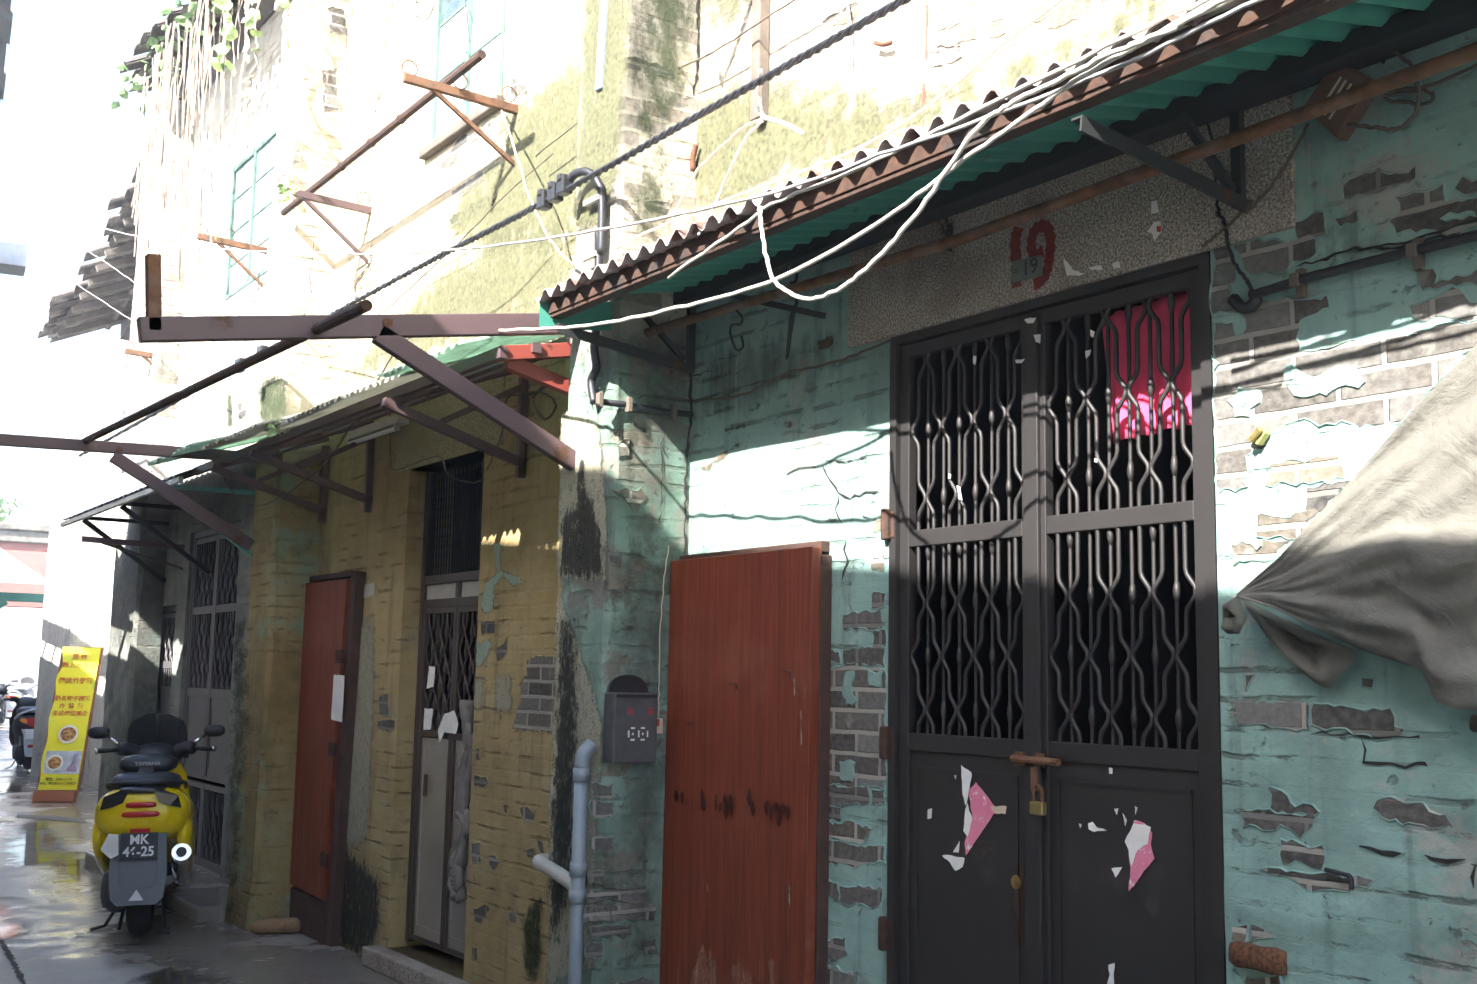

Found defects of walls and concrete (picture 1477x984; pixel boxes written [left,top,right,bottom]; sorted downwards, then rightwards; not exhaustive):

peeling [1233,165,1477,276]
peeling [1209,267,1477,567]
water stain [558,457,604,580]
crack [822,453,878,582]
peeling [480,620,508,661]
peeling [512,654,557,735]
water stain [546,618,580,942]
peeling [828,591,888,910]
peeling [1239,785,1375,893]
peeling [1234,674,1405,742]
peeling [1372,795,1453,830]
water stain [340,853,381,956]